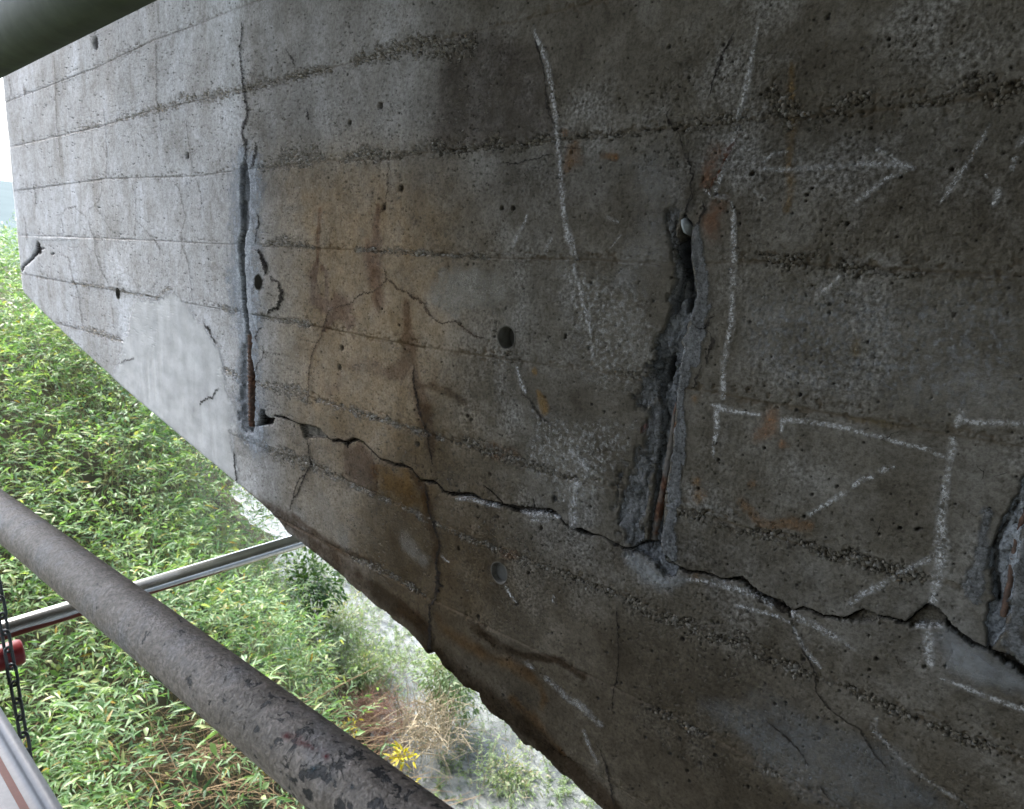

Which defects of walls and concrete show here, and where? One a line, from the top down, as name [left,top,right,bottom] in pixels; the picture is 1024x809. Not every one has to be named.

crack [238,22,257,170]
crack [277,266,654,651]
spalling [618,208,711,576]
crack [673,561,1024,770]
spalling [961,477,1024,663]